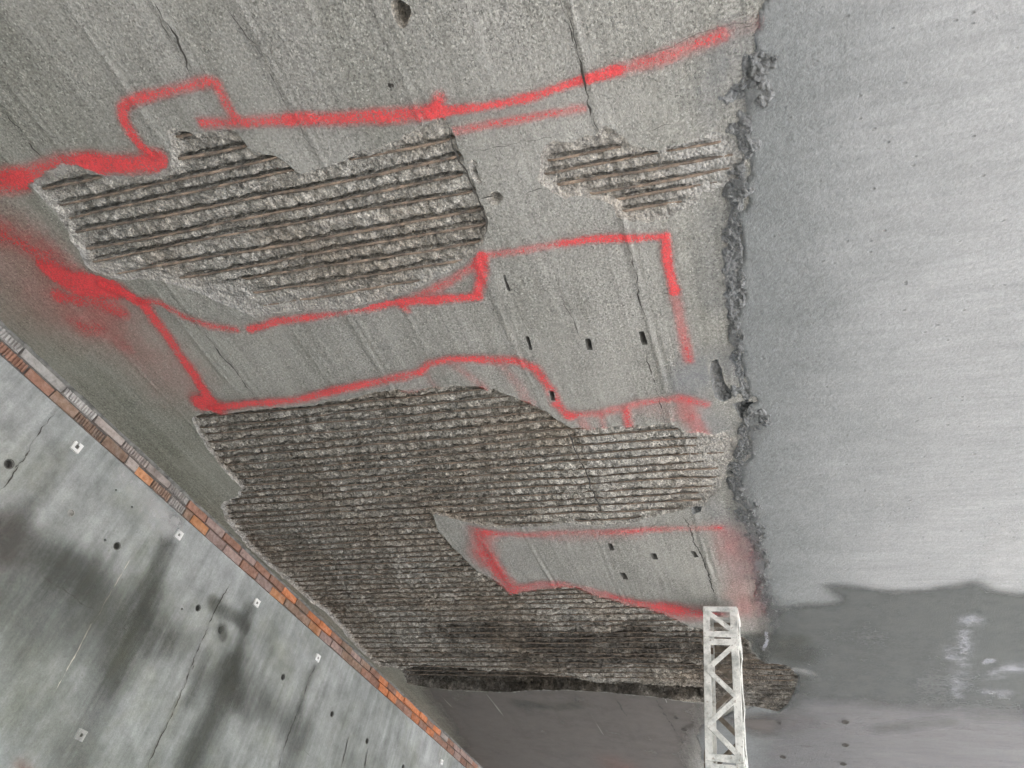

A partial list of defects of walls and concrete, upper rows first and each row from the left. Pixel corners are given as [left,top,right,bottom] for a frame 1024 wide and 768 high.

crack [154,3,193,83]
crack [560,1,601,133]
spalling [30,118,503,318]
spalling [537,126,747,223]
spalling [709,359,753,419]
spalling [192,385,799,724]
crack [683,517,715,595]
leakage [729,583,1024,768]